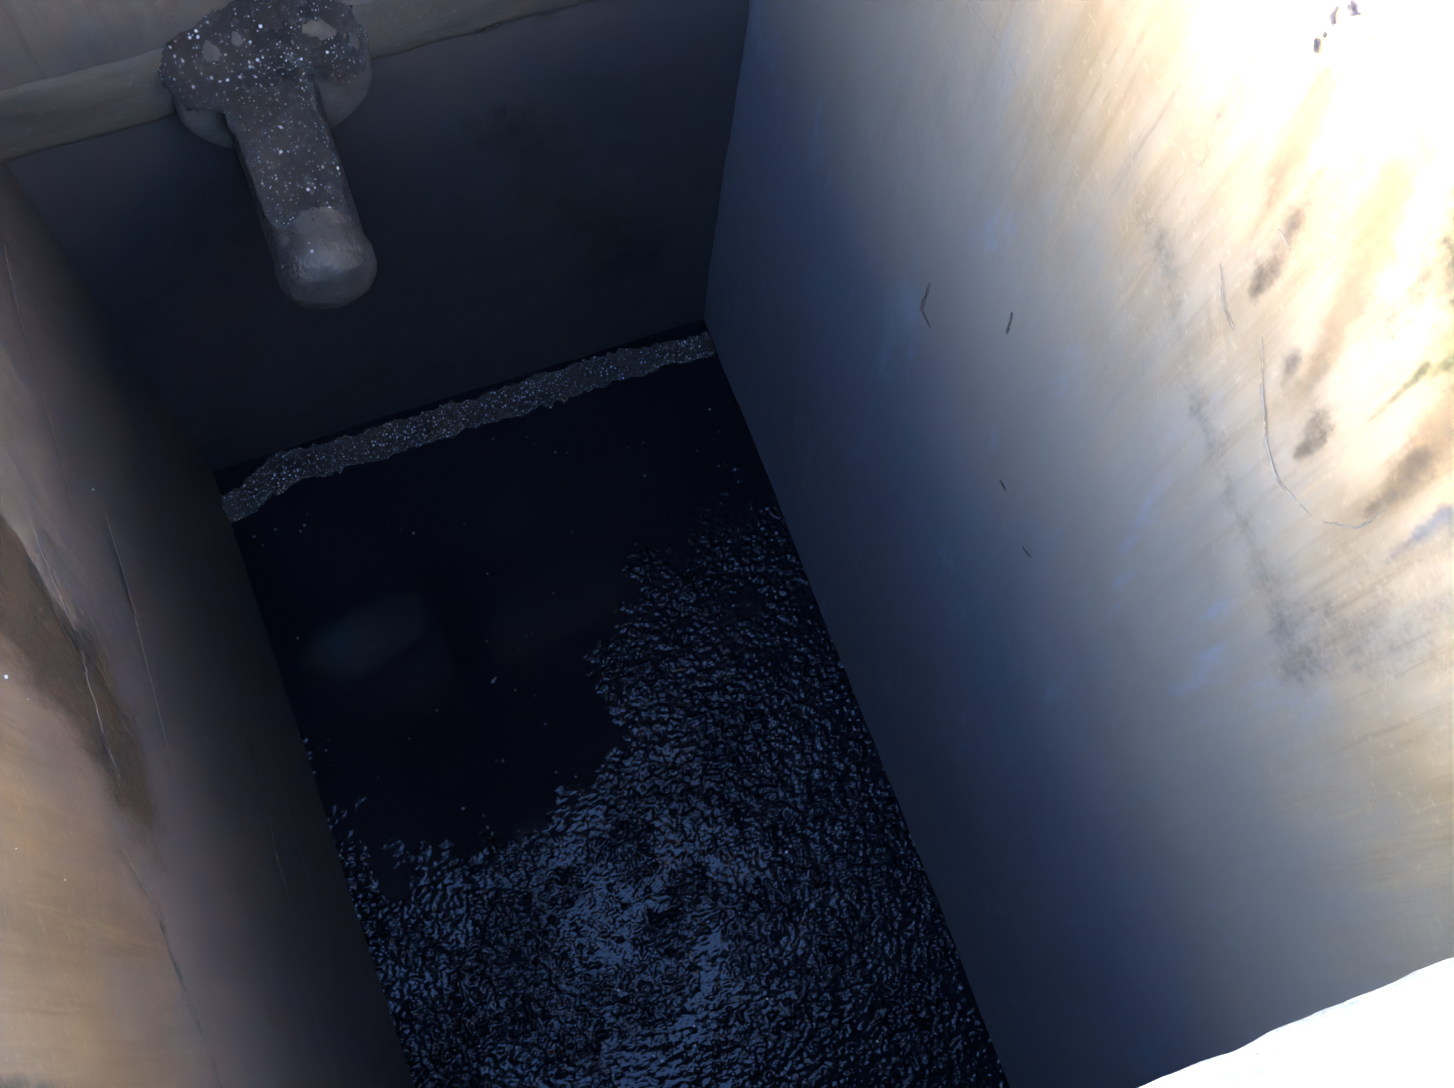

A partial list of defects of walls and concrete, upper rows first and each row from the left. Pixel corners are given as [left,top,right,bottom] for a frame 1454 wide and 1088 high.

peeling [1313,0,1371,53]
damp [1392,351,1454,400]